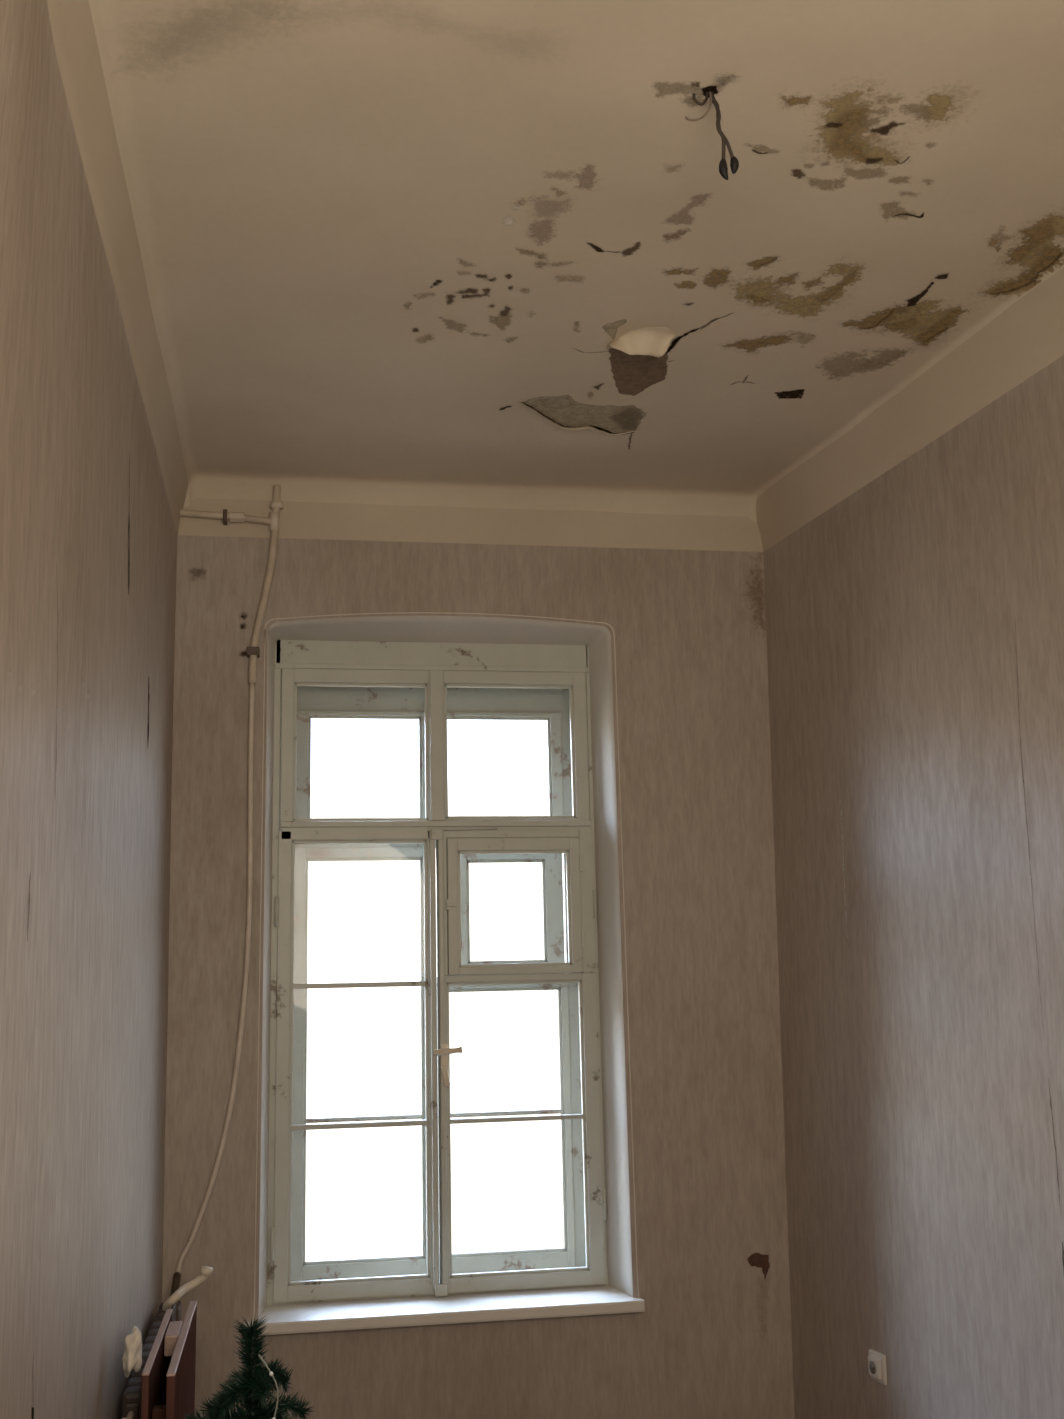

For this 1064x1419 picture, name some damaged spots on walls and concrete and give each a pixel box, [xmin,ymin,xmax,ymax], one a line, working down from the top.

spalling [505,165,596,267]
peeling [749,145,778,154]
peeling [791,162,907,190]
peeling [883,202,924,219]
peeling [405,260,528,342]
peeling [500,318,718,450]